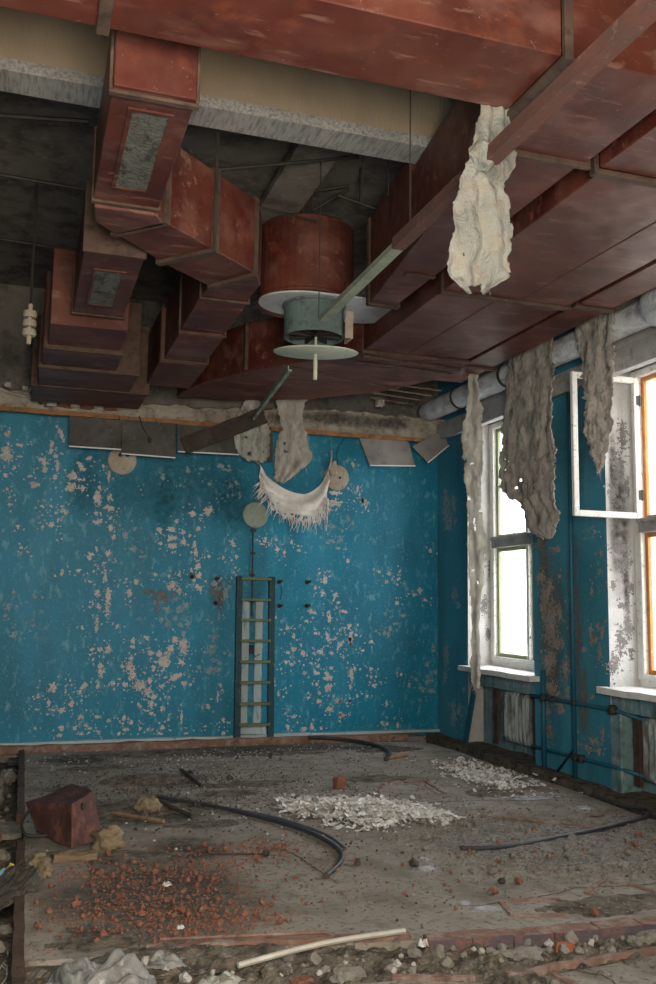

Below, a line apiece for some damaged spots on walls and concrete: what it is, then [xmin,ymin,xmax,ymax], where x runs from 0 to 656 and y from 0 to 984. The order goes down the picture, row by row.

spalling [0,382,117,411]
peeling [0,421,242,739]
peeling [257,533,307,566]
peeling [319,484,370,563]
peeling [274,565,468,733]
leakage [610,448,629,611]